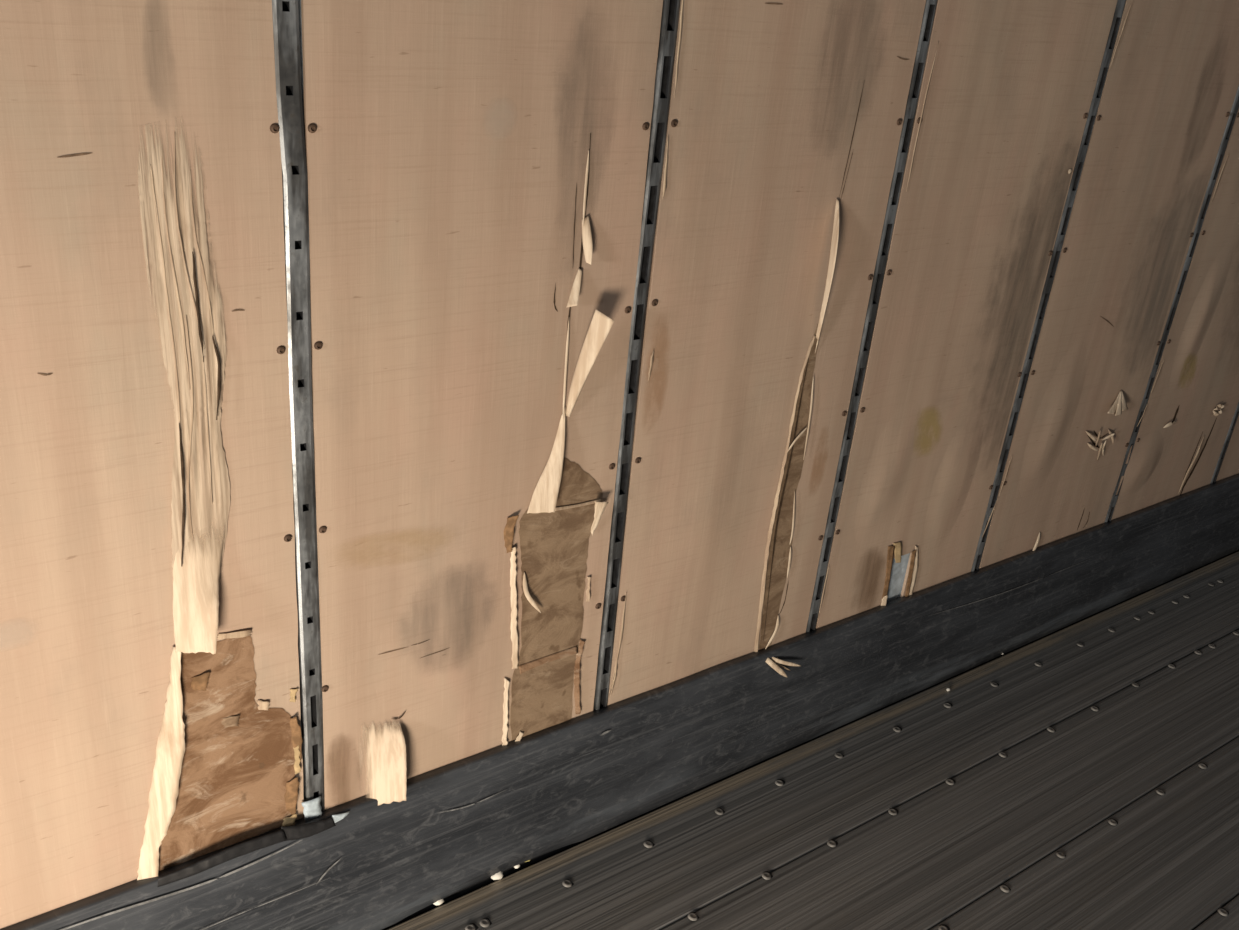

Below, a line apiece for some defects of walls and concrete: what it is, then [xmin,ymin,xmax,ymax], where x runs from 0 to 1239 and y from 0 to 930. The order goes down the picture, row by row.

peeling [566,215,593,308]
spalling [502,458,609,745]
spalling [158,630,303,871]